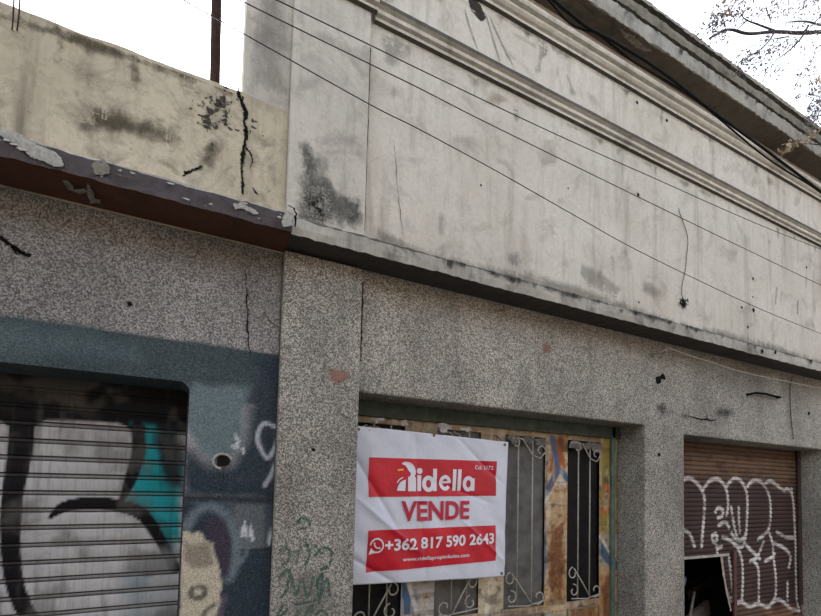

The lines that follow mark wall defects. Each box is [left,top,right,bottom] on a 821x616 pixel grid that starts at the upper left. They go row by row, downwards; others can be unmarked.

peeling [189,86,264,144]
peeling [0,123,64,167]
crack [236,87,259,195]
spalling [62,180,101,204]
peeling [92,160,136,177]
peeling [233,202,266,219]
peeling [277,210,294,227]
leakage [301,147,359,223]
crack [245,269,278,354]